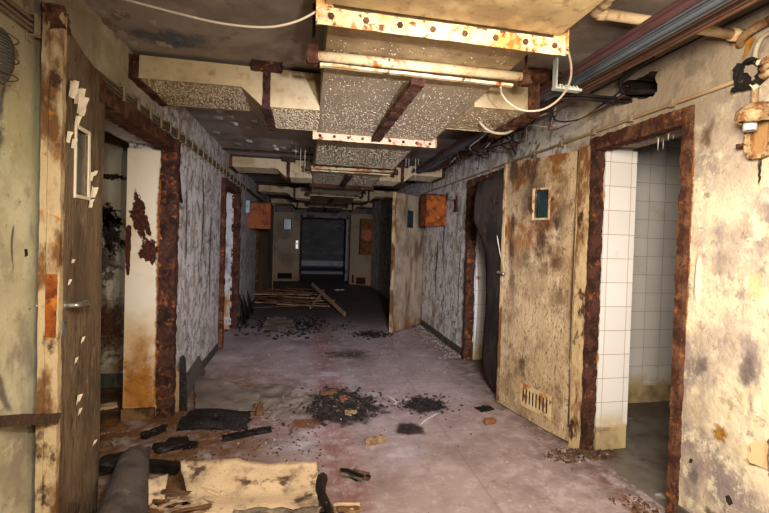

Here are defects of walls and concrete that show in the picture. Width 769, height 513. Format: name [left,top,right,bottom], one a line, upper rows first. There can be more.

flaking render [747,439,769,476]